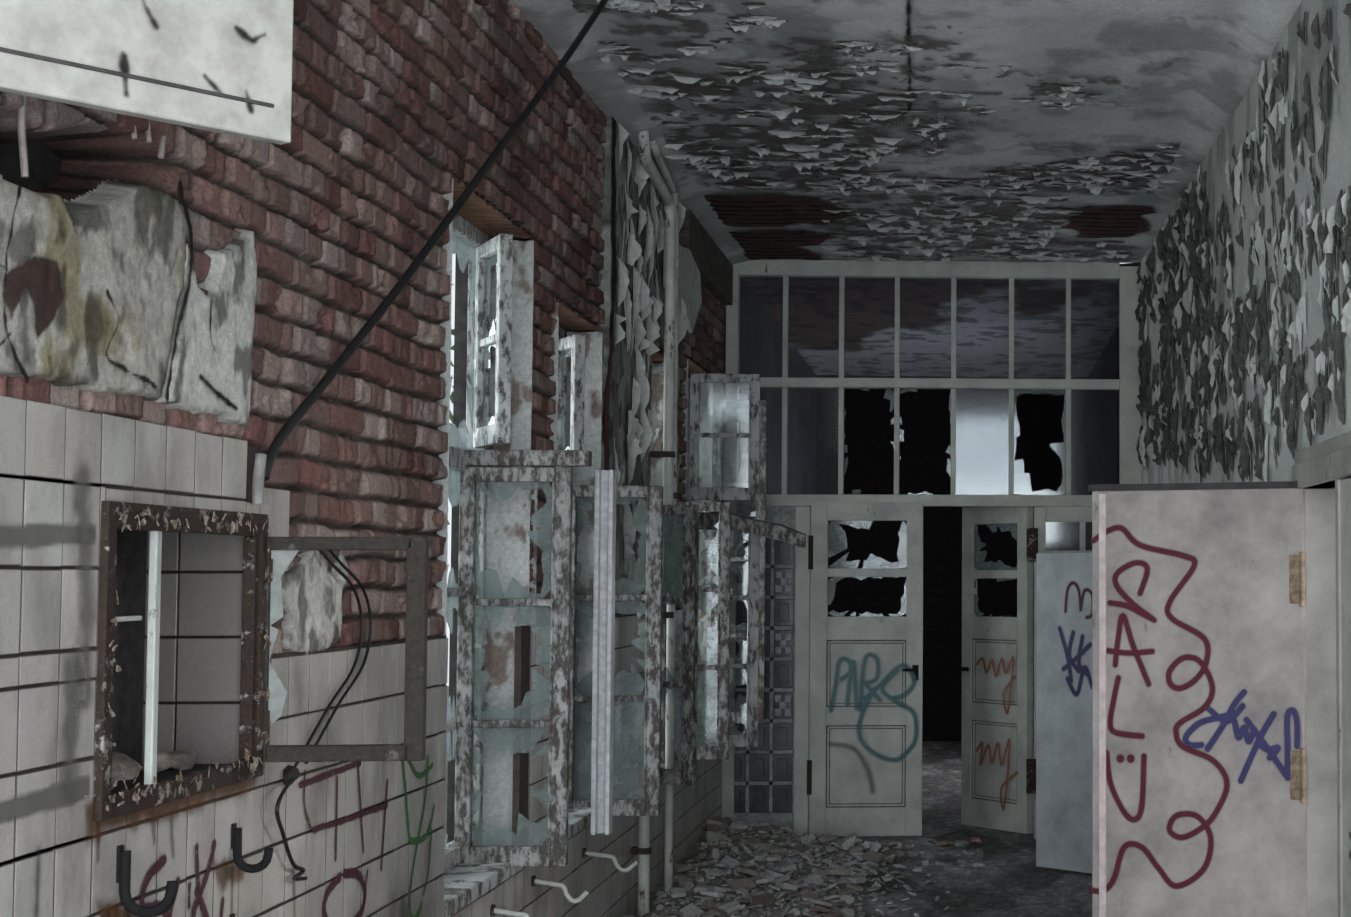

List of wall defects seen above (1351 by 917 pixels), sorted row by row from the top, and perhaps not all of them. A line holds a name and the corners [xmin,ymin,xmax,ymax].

flaking render [0,174,257,427]
flaking render [281,550,349,654]
flaking render [595,117,688,616]
peeling [571,0,1351,483]